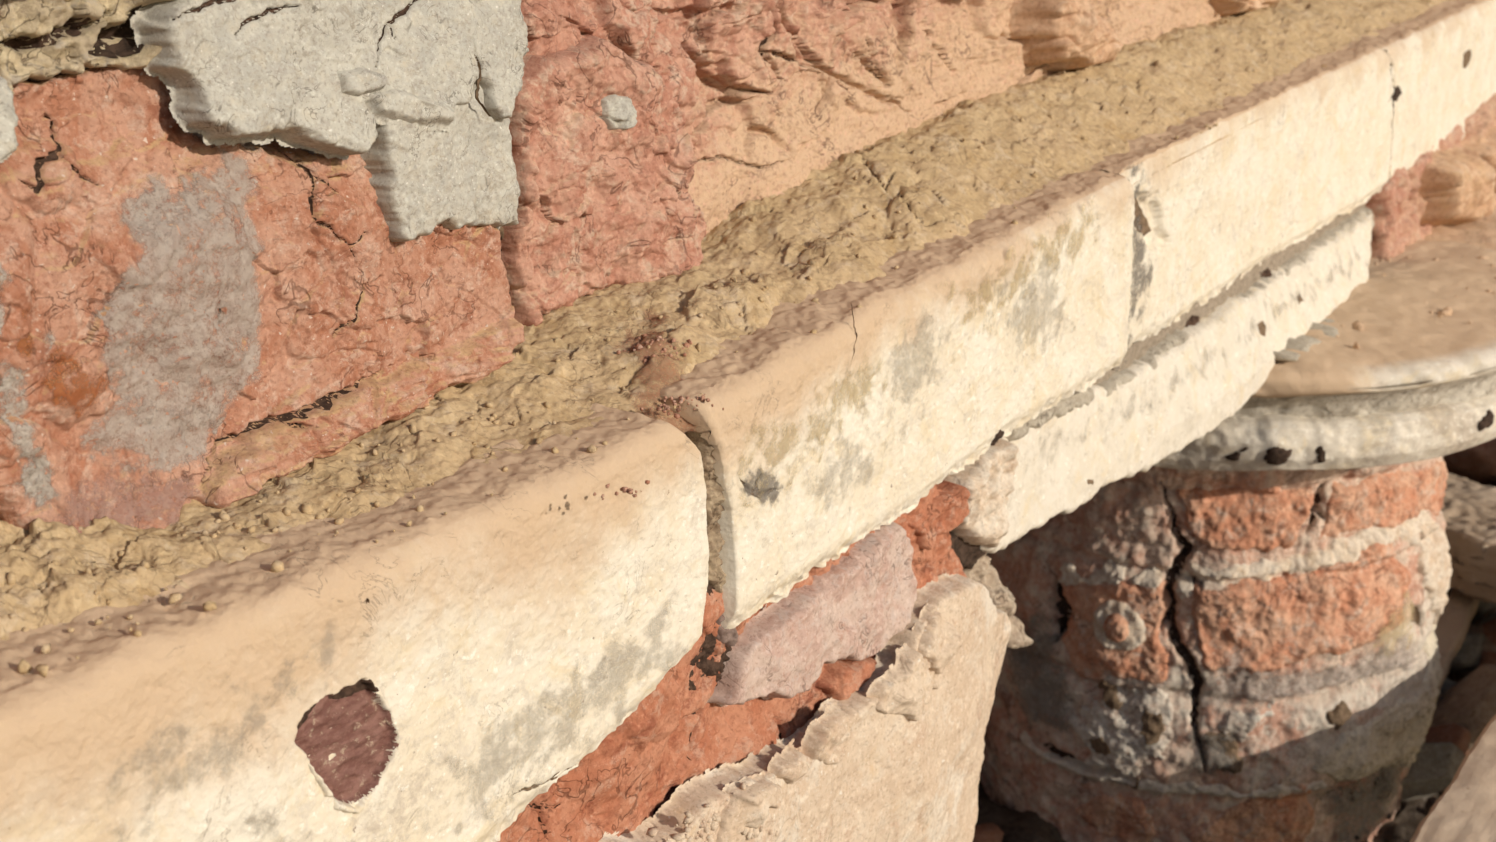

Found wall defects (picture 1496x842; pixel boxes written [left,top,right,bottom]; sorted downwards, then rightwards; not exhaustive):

crack [172,0,298,34]
crack [377,0,418,52]
crack [0,17,100,194]
crack [474,54,491,117]
crack [278,151,365,334]
peeling [1133,198,1151,235]
crack [206,376,369,459]
crack [1161,481,1205,765]
peeling [294,679,399,814]